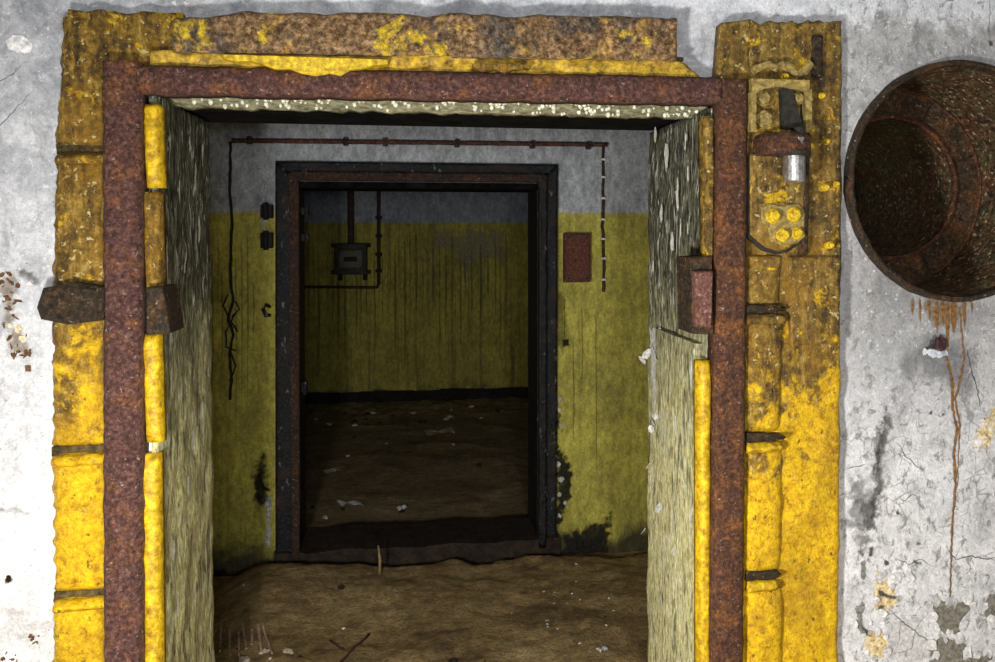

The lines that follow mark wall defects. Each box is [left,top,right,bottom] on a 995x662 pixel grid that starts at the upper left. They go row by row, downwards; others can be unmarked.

corrosion [0,272,33,372]
damp [253,454,270,506]
damp [561,512,611,555]
damp [848,407,892,583]
corrosion [911,299,973,597]